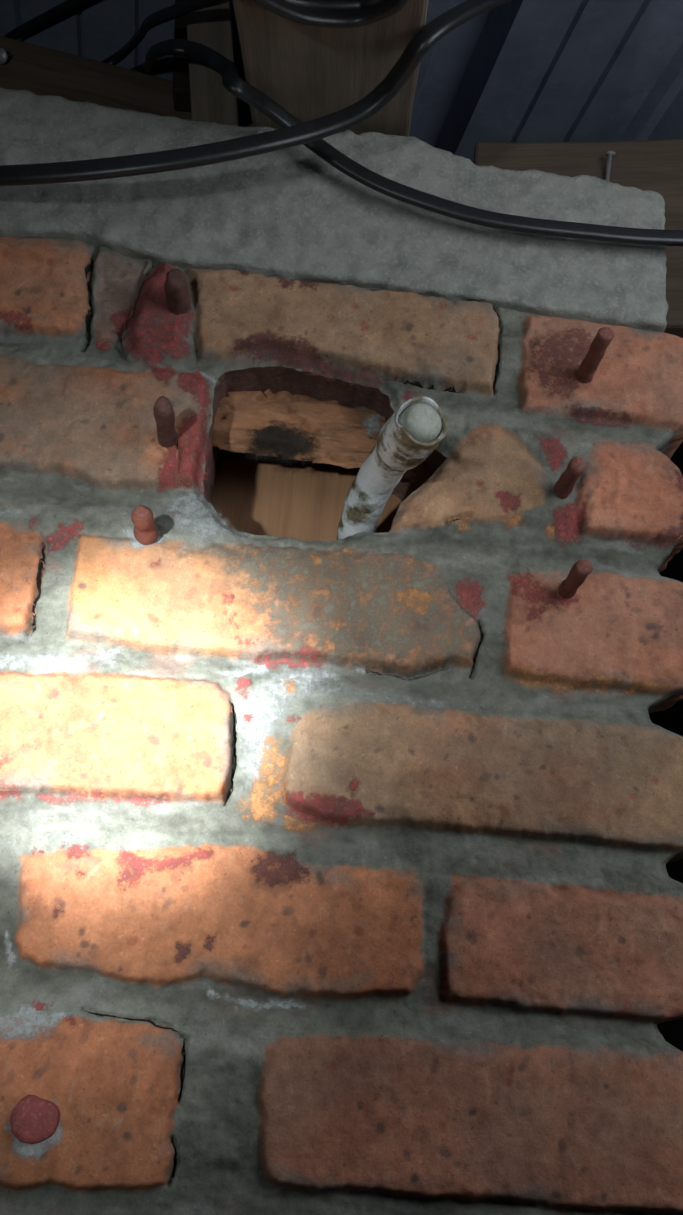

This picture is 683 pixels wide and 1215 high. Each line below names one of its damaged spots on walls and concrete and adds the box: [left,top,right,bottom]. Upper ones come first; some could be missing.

spalling [97,262,417,504]
spalling [392,449,447,502]
crack [32,546,45,632]
crack [86,1011,185,1105]